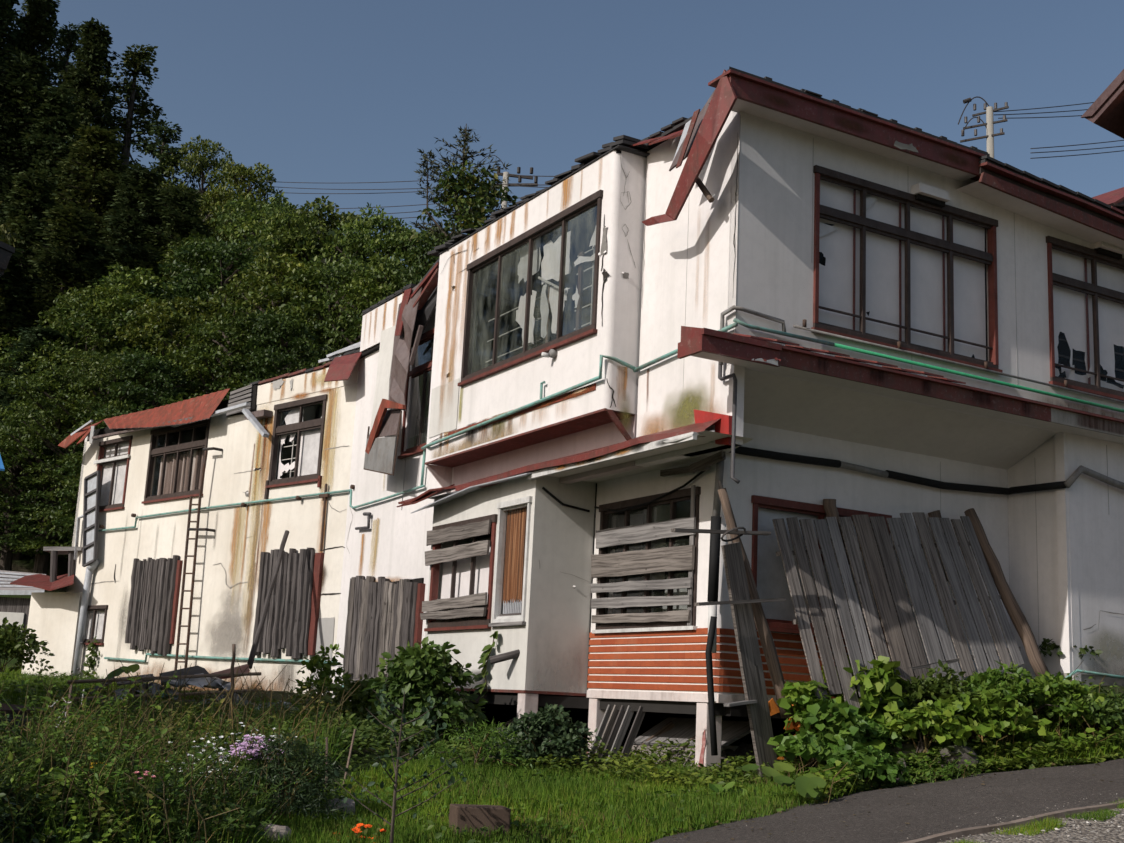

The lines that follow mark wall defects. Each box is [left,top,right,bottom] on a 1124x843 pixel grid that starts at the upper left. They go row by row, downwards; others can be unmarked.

rust [441,204,527,378]
rust [563,177,572,207]
crack [601,156,647,316]
rust [231,416,273,642]
rust [271,368,338,553]
damp [211,596,242,656]